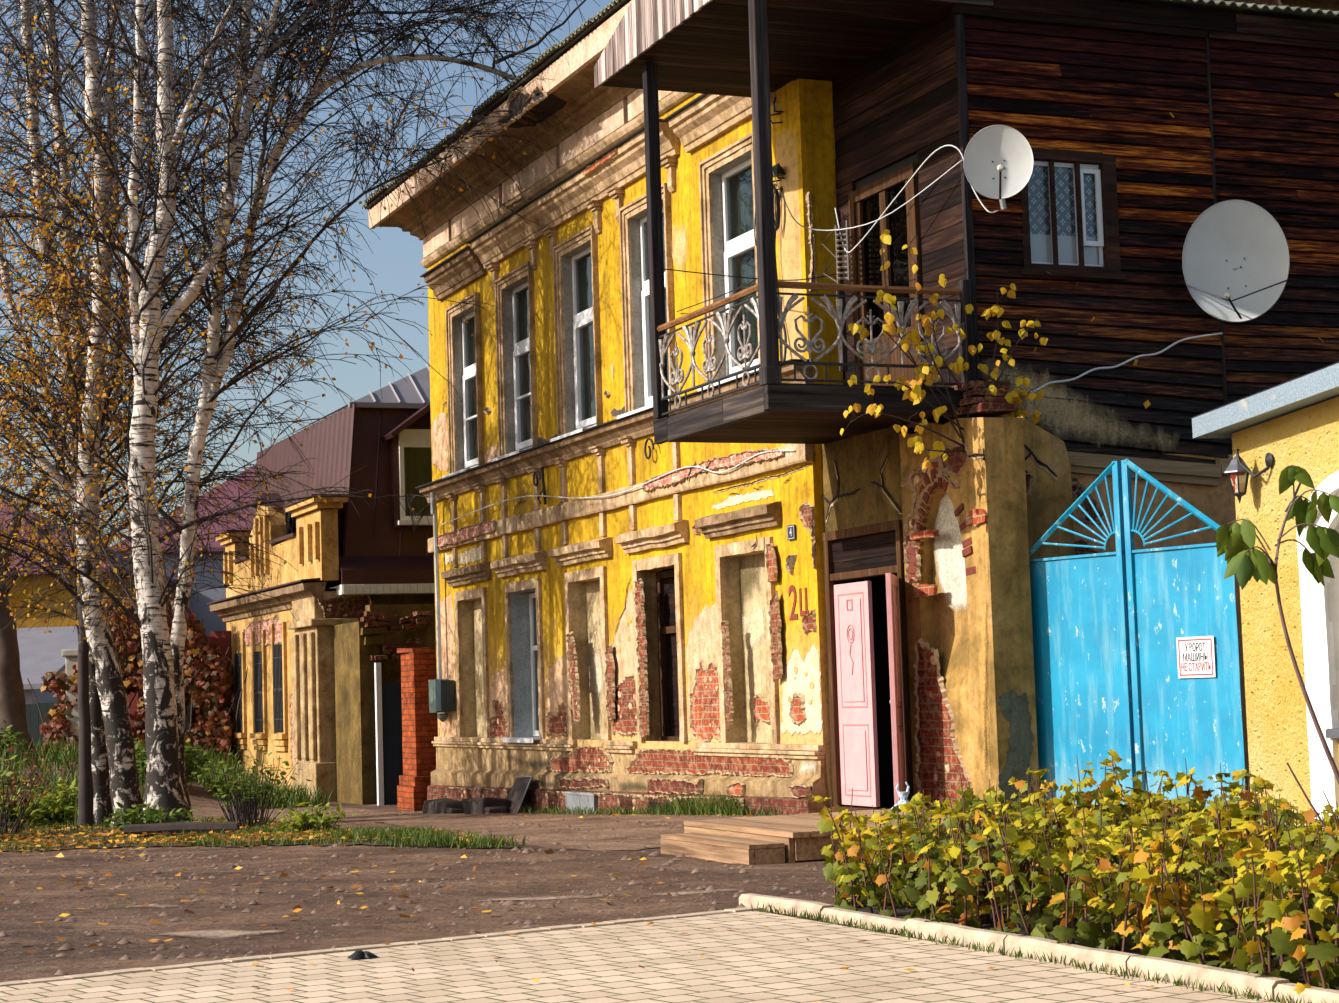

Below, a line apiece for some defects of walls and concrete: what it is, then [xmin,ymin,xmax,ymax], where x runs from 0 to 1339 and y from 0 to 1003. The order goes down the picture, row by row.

spalling [643,448,784,492]
crack [687,455,902,522]
spalling [899,443,971,597]
spalling [965,509,988,527]
peeling [751,500,823,736]
spalling [545,578,812,814]
spalling [913,638,971,810]